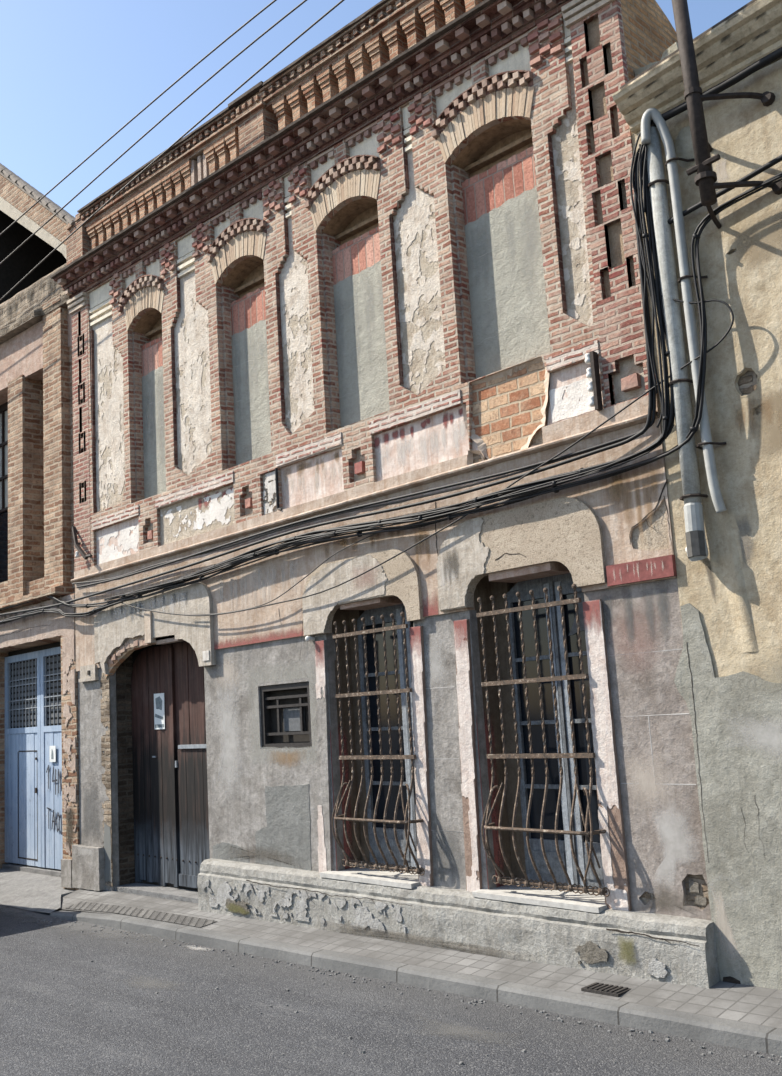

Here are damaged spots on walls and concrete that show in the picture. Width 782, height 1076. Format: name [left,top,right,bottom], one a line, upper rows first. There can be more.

peeling [393,134,446,395]
peeling [279,203,314,434]
peeling [92,304,125,512]
peeling [174,257,212,475]
flaking render [462,357,595,471]
flaking render [733,366,764,417]
peeling [97,524,139,565]
peeling [161,488,234,541]
crack [629,479,673,554]
flaking render [684,874,709,910]
spalling [575,941,608,964]